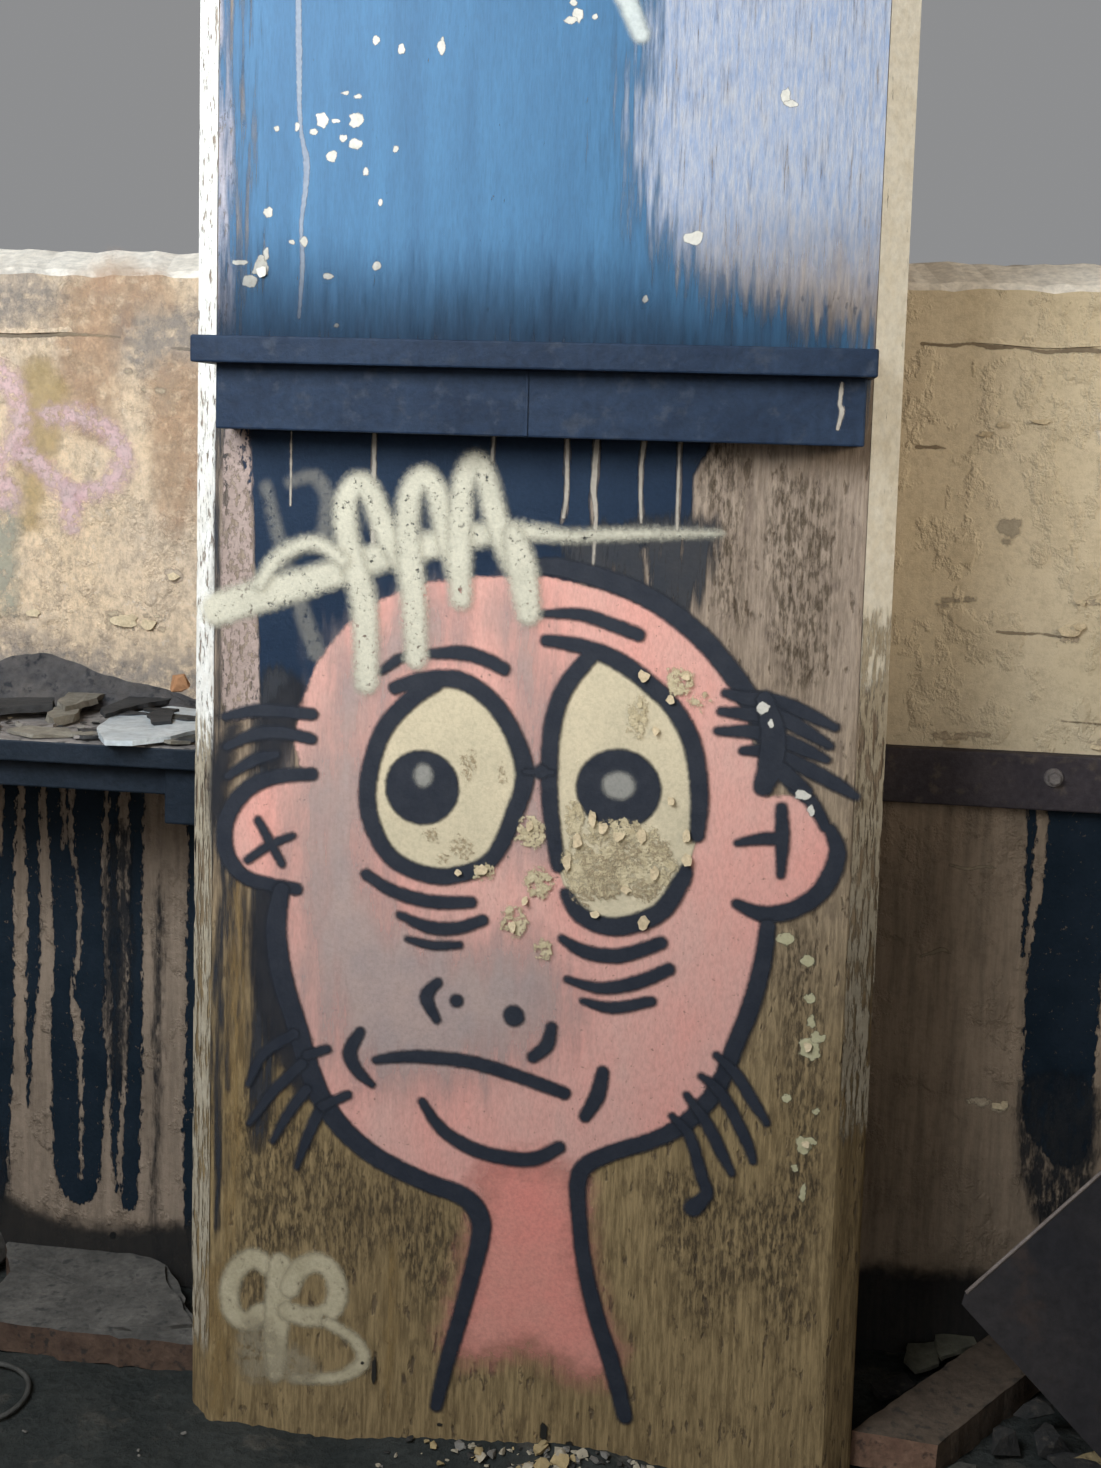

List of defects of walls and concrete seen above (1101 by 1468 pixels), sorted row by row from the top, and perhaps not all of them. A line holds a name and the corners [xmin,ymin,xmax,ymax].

peeling [564,0,598,24]
peeling [437,37,445,55]
peeling [274,91,364,162]
crack [921,336,1101,354]
peeling [799,0,922,1141]
peeling [425,828,495,881]
peeling [499,800,692,960]
peeling [775,933,814,967]
peeling [791,1136,817,1202]